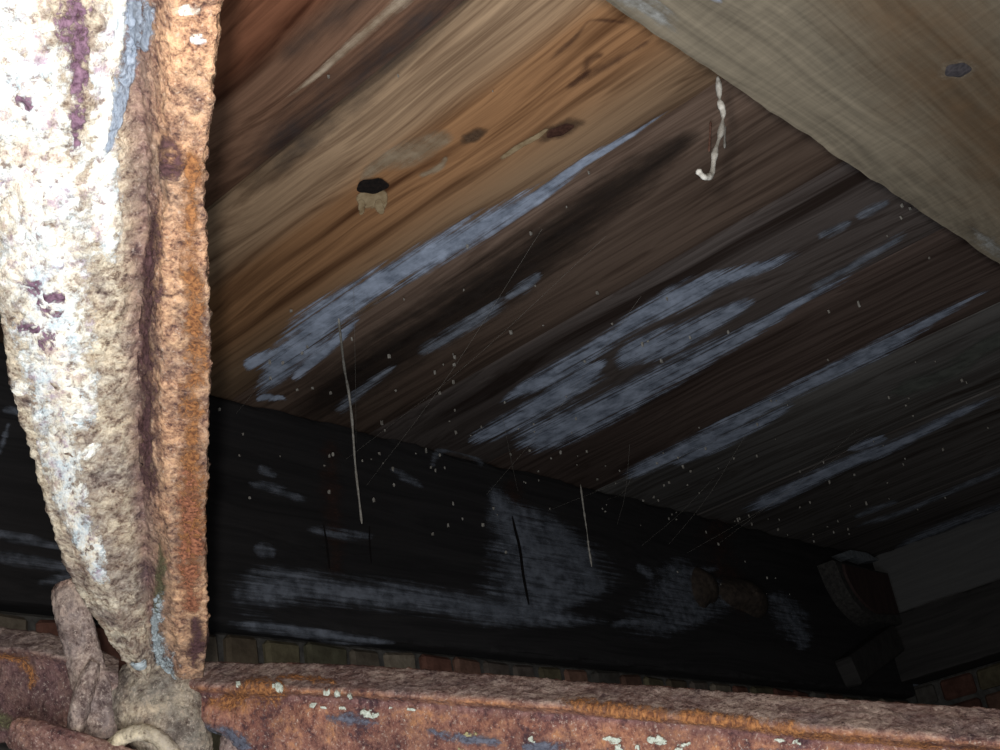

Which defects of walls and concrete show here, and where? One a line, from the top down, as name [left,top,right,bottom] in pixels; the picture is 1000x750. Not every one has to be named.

leakage [243,117,690,410]
corrosion [137,202,163,505]
corrosion [153,135,209,669]
leakage [252,466,303,501]
leakage [469,236,902,453]
leakage [627,293,984,479]
leakage [745,398,993,511]
corrosion [209,673,336,711]
leakage [240,622,388,644]
leakage [245,492,609,627]
leakage [615,565,729,631]
corrosion [564,697,980,750]